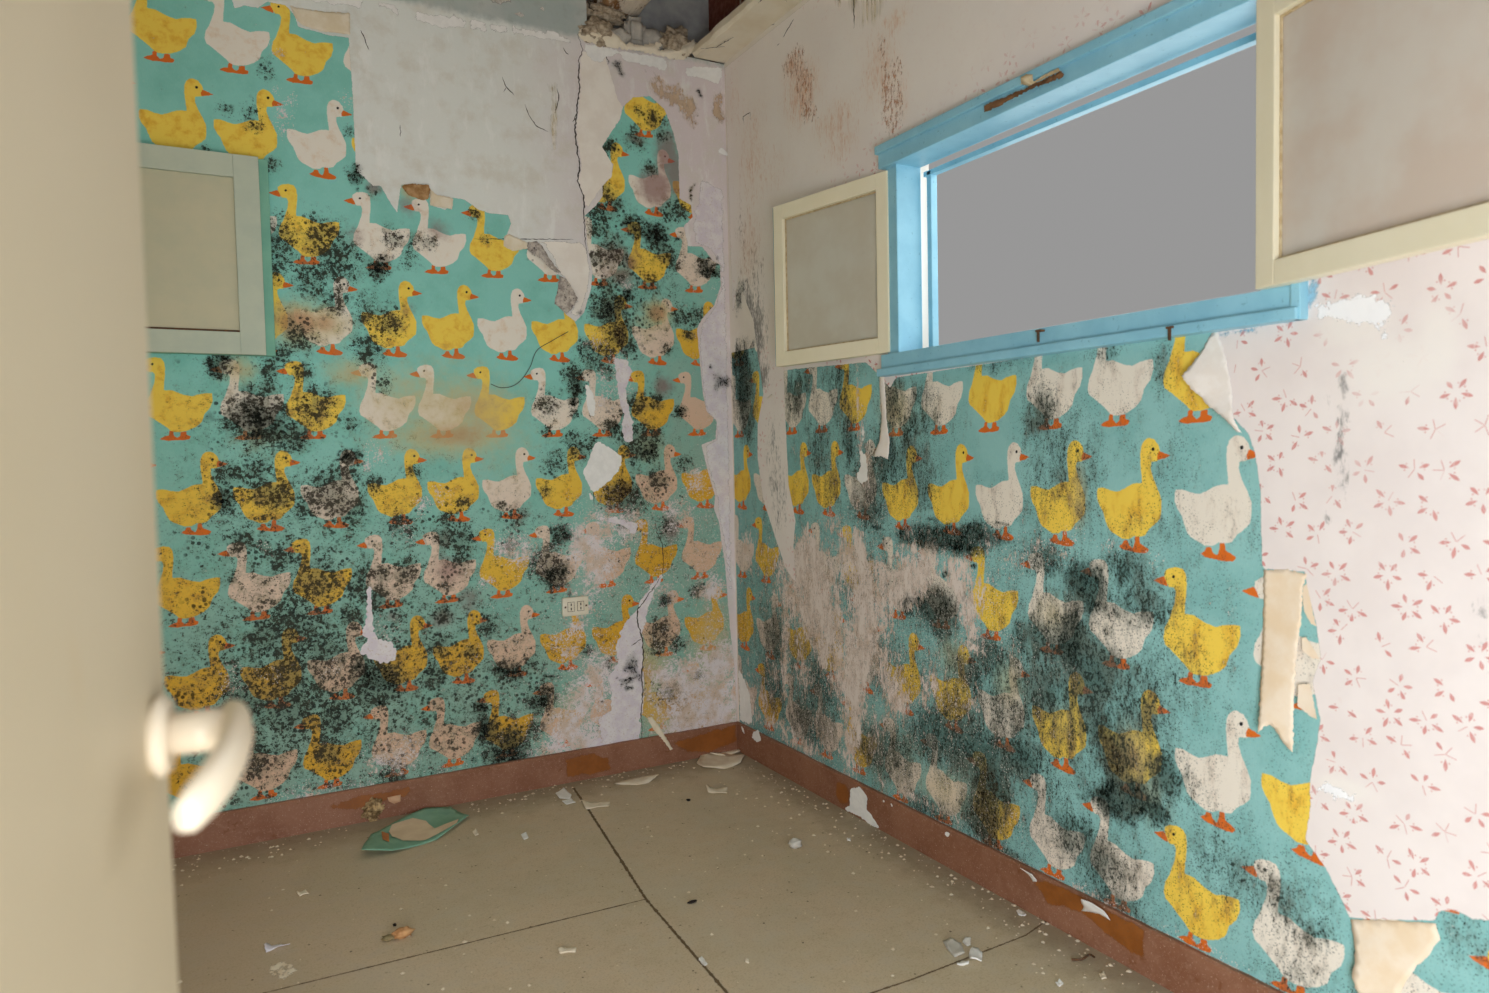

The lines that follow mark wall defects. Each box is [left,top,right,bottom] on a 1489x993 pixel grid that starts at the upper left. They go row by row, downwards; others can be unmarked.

crack [498,0,608,254]
peeling [576,1,697,206]
damp [369,256,389,281]
damp [624,217,679,252]
damp [709,340,755,409]
damp [207,385,304,447]
damp [872,519,1014,568]
peeling [1302,584,1319,659]
damp [471,700,526,763]
peeling [565,574,663,777]
peeling [1297,684,1317,719]
damp [1076,715,1169,828]